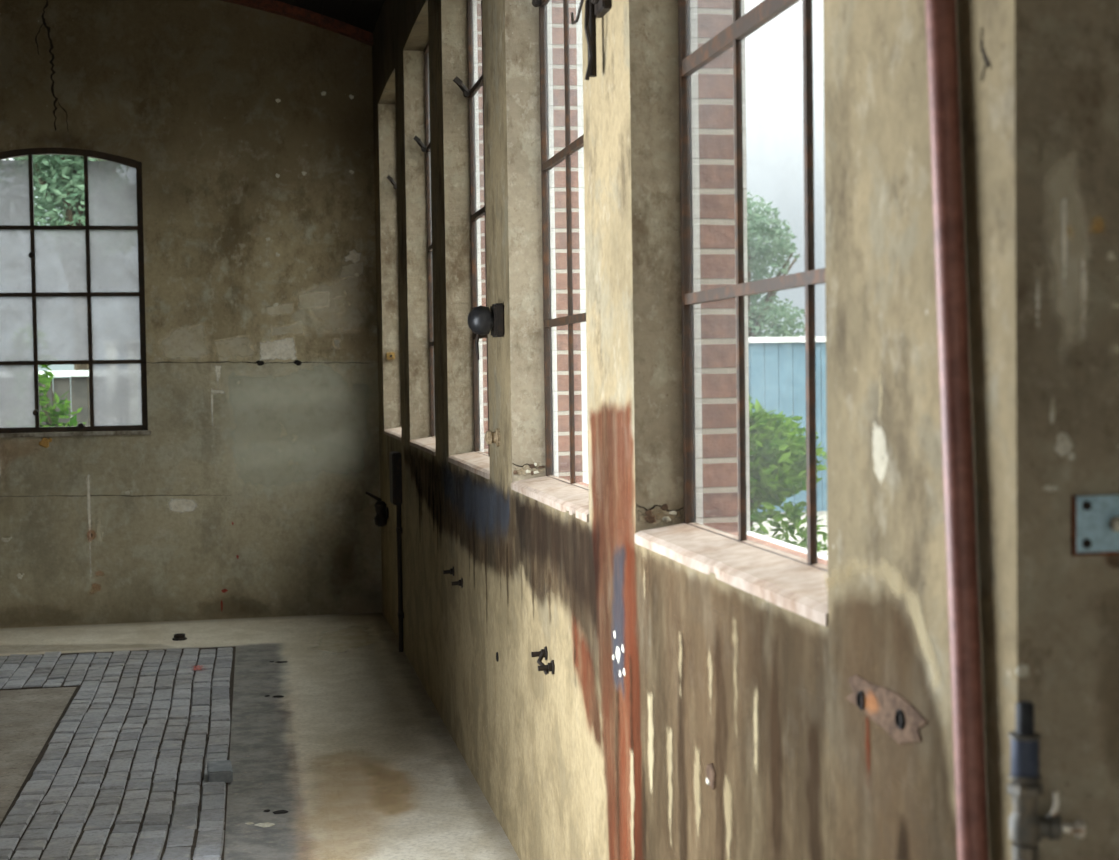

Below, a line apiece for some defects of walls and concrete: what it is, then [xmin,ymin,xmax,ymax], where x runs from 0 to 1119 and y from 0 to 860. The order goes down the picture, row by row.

crack [35,0,68,131]